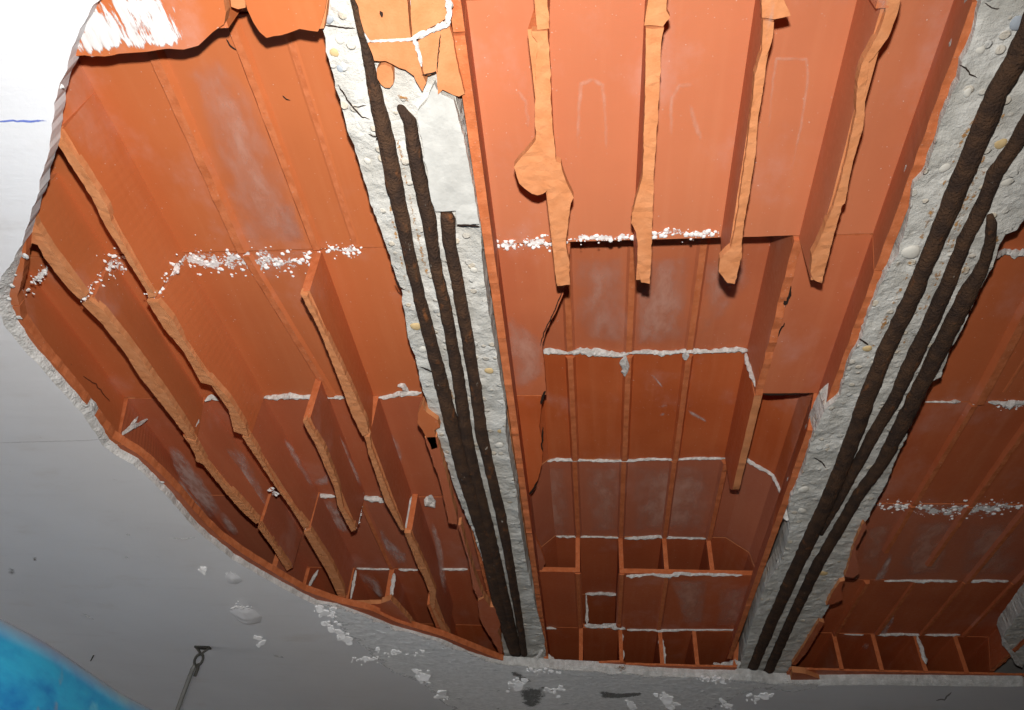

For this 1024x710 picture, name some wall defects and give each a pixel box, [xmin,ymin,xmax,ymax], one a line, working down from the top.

damp [81,247,127,302]
damp [144,239,363,295]
spalling [323,0,483,561]
damp [497,234,552,252]
damp [566,233,633,245]
damp [652,227,719,243]
spalling [738,0,1024,669]
peeling [0,147,1024,710]
damp [879,499,1023,572]
damp [971,531,1009,583]